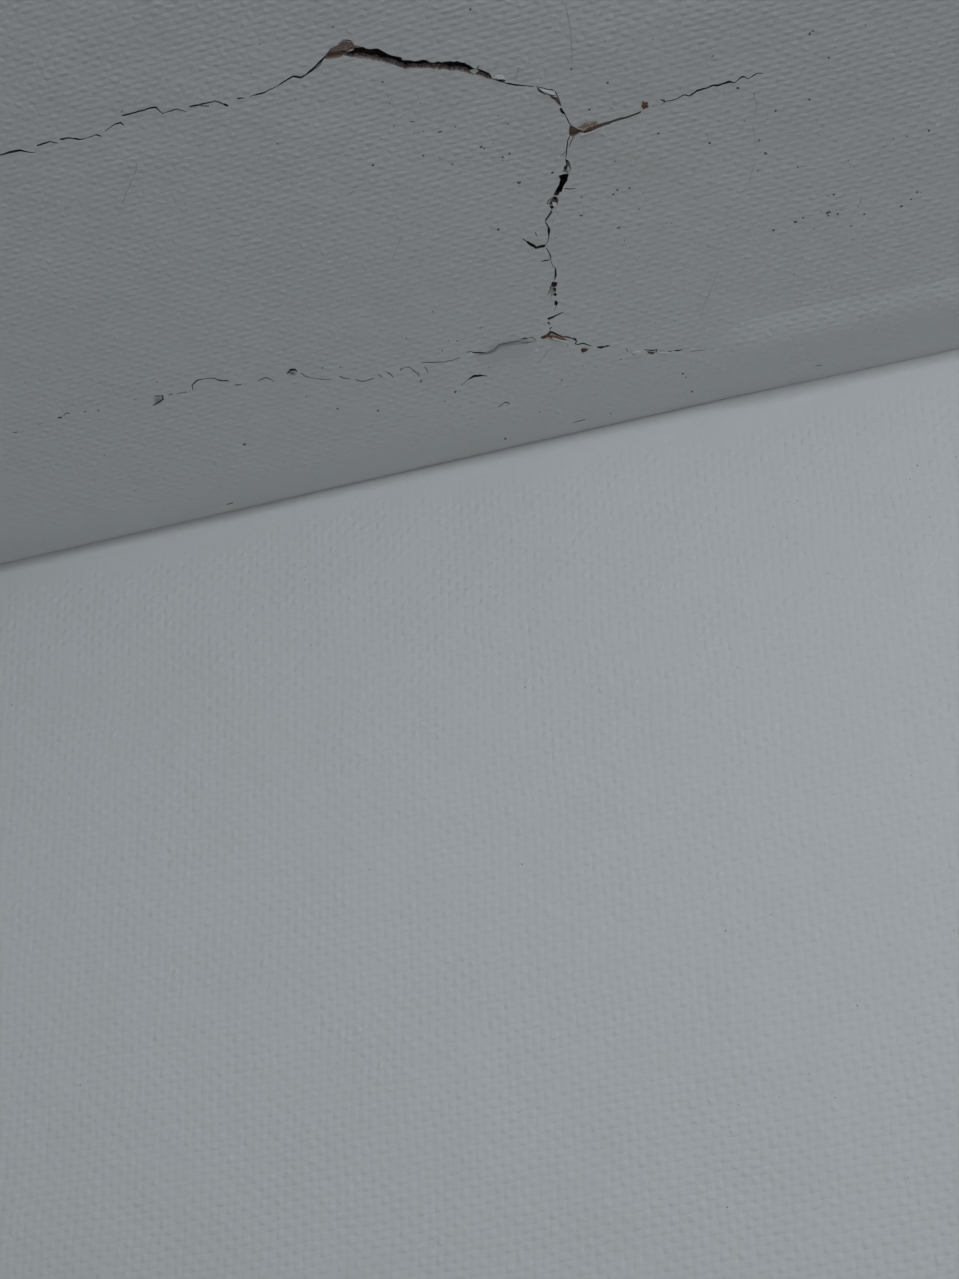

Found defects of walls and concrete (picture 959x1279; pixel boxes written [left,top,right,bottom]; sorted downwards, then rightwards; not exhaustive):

crack [0,40,762,406]